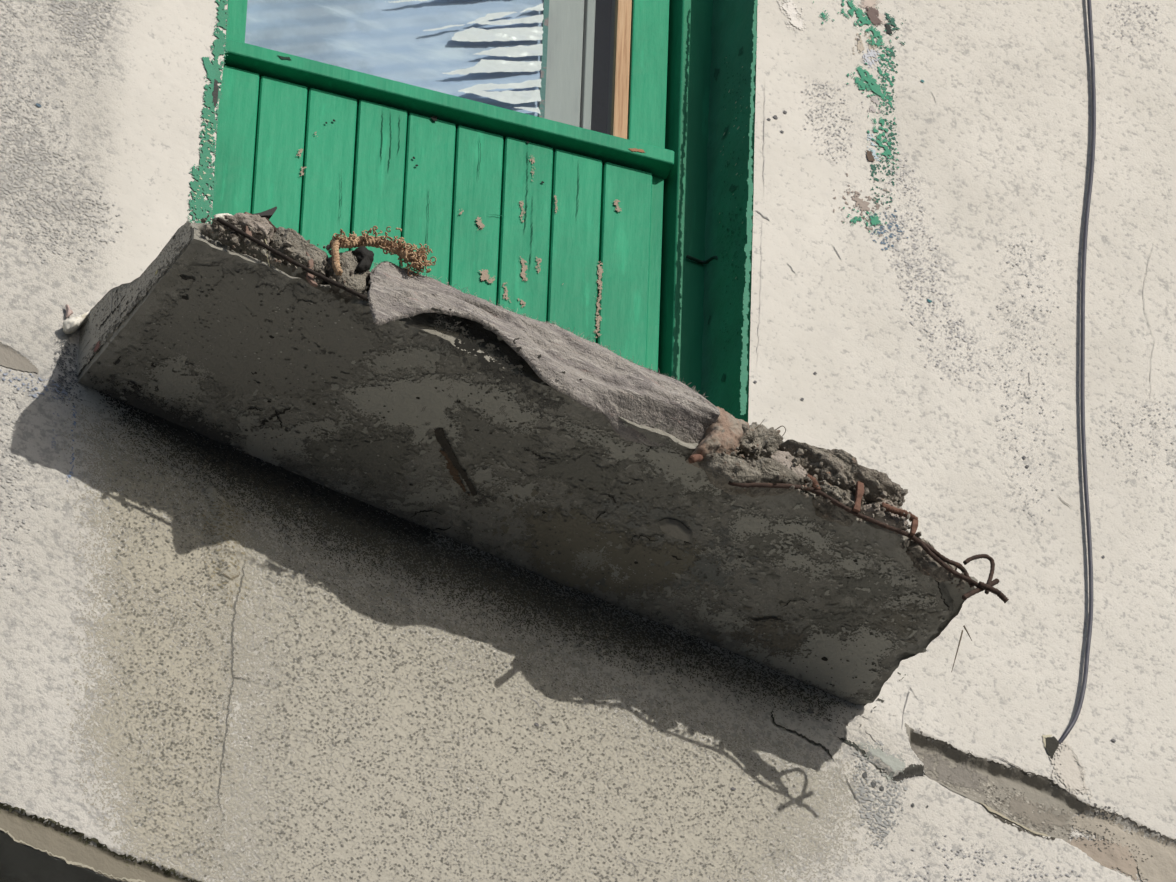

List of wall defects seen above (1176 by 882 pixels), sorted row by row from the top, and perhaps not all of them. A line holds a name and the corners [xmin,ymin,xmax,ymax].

spalling [860,0,886,26]
rust [434,428,477,496]
rust [880,502,918,521]
crack [771,709,926,803]
spalling [863,723,1176,882]
crack [926,736,1176,841]
spalling [0,809,190,882]